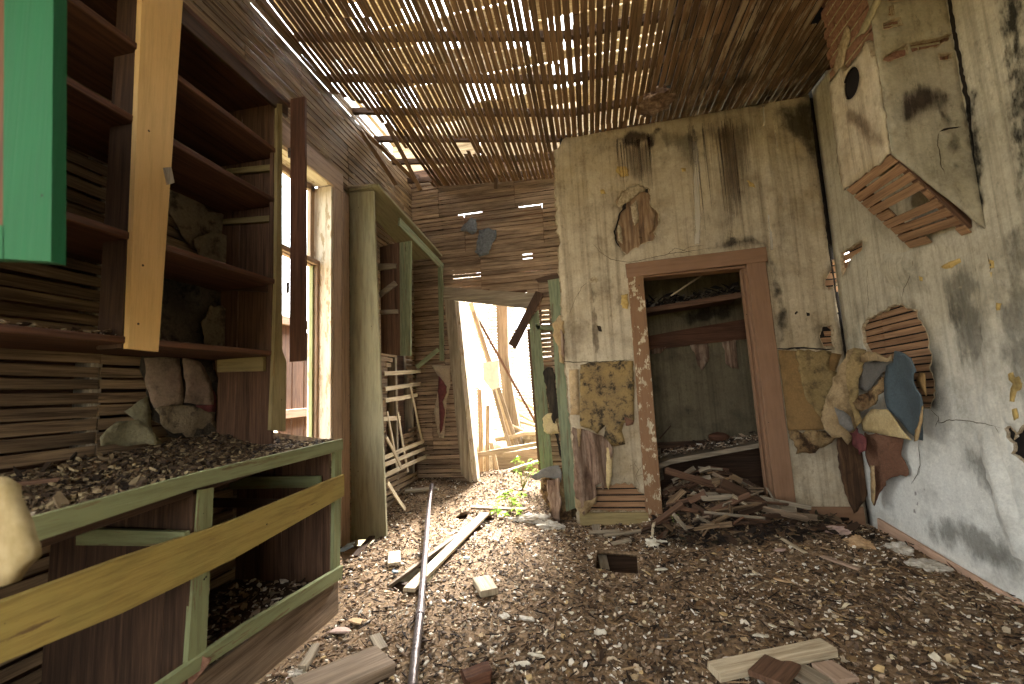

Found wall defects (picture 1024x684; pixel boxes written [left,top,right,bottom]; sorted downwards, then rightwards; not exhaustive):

water stain [624,128,659,147]
water stain [782,103,815,156]
crack [937,0,972,174]
flaking render [600,166,660,255]
flaking render [824,240,863,292]
peeling [796,312,838,417]
flaking render [861,303,936,409]
crack [931,410,998,431]
flaking render [1005,372,1024,463]